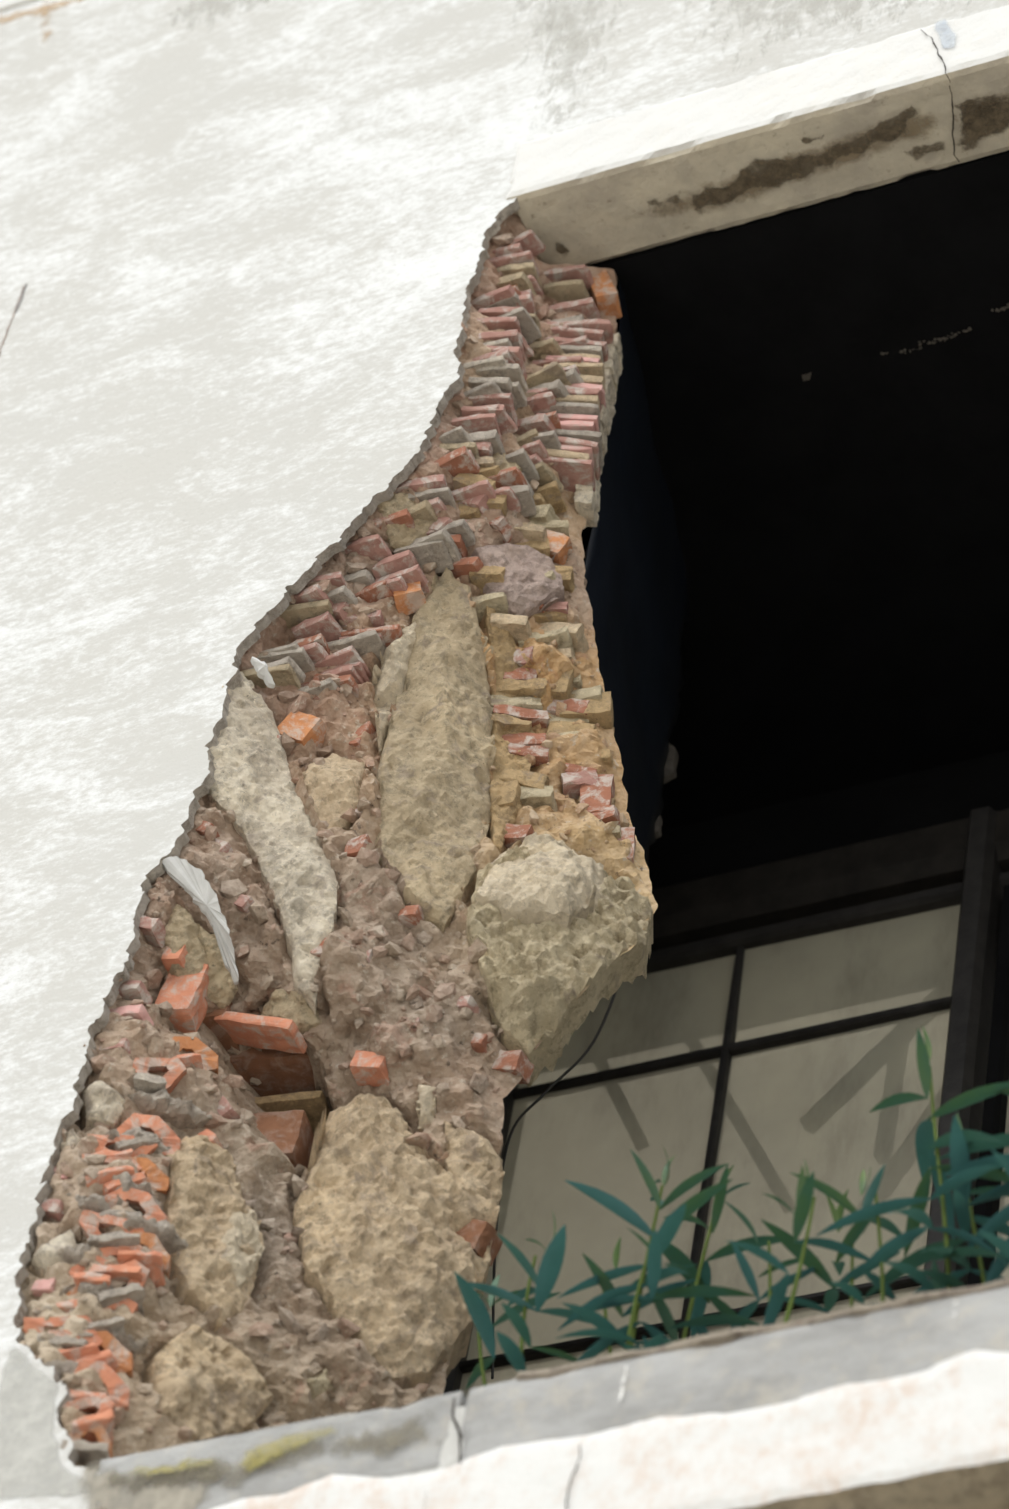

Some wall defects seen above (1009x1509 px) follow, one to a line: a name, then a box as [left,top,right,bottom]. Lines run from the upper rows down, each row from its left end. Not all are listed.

leakage [647,95,1009,214]
crack [920,29,959,162]
peeling [663,743,678,784]
spalling [19,213,662,1469]
crack [566,1445,581,1509]